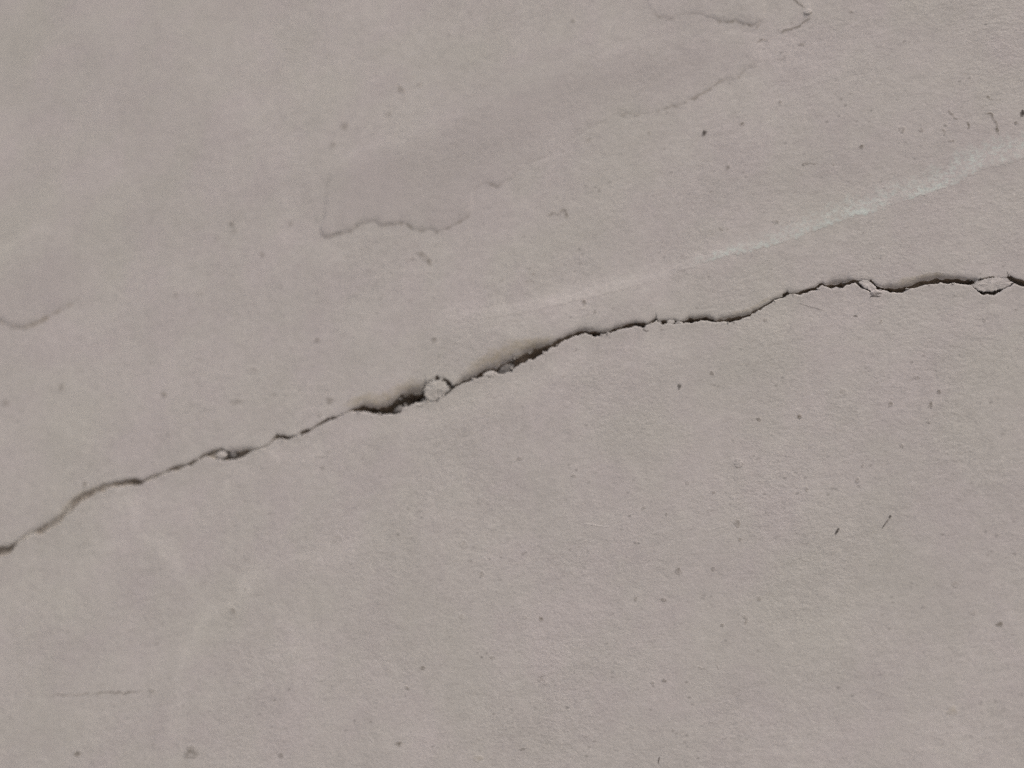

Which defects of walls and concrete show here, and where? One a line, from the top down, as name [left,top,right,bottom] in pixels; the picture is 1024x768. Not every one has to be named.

crack [0,271,1024,557]